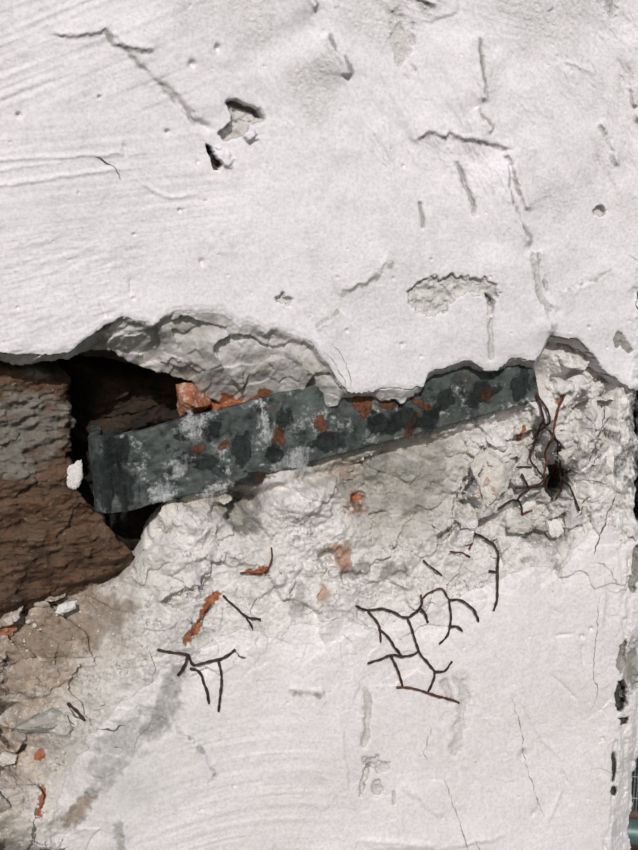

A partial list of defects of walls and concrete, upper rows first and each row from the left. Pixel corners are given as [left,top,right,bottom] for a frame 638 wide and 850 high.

flaking render [218,99,263,141]
flaking render [407,273,498,359]
flaking render [613,331,633,353]
flaking render [0,313,595,407]
corrosion [210,388,271,410]
corrosion [353,396,395,418]
flaking render [597,372,636,397]
corrosion [314,413,329,433]
flaking render [67,460,83,490]
flaking render [628,546,638,592]
crack [609,752,617,781]
crack [444,780,480,850]